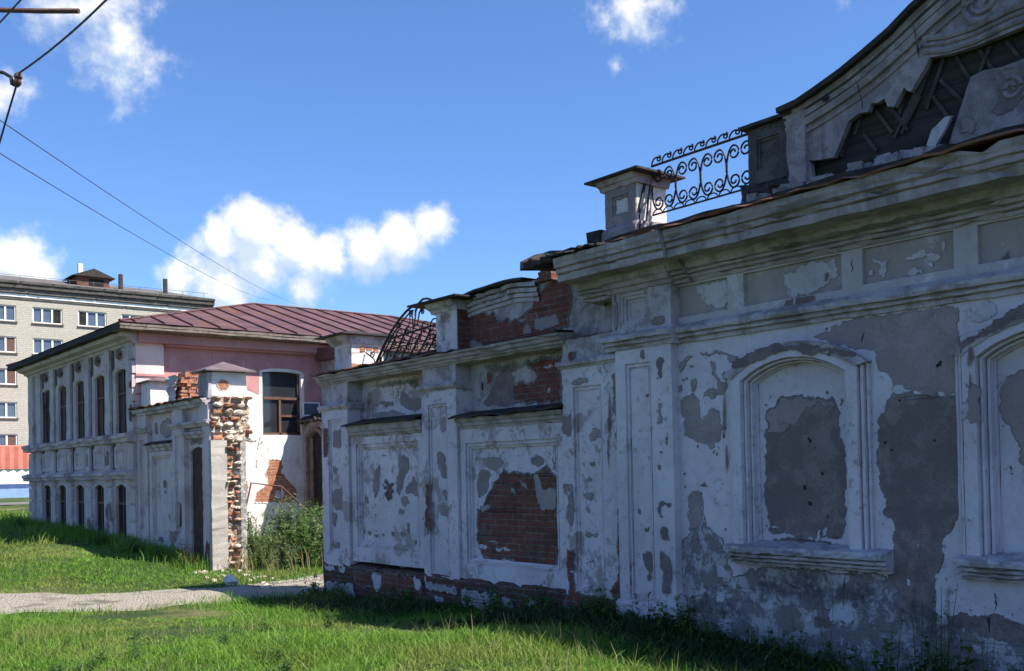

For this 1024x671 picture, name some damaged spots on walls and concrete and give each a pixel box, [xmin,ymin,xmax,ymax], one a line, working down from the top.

spalling [839,46,995,157]
flaking render [469,279,572,347]
peeling [783,259,838,306]
flaking render [481,351,588,408]
spalling [190,379,298,569]
peeling [363,451,448,544]
flaking render [476,455,632,616]
peeling [640,301,1024,671]
spalling [324,565,514,611]